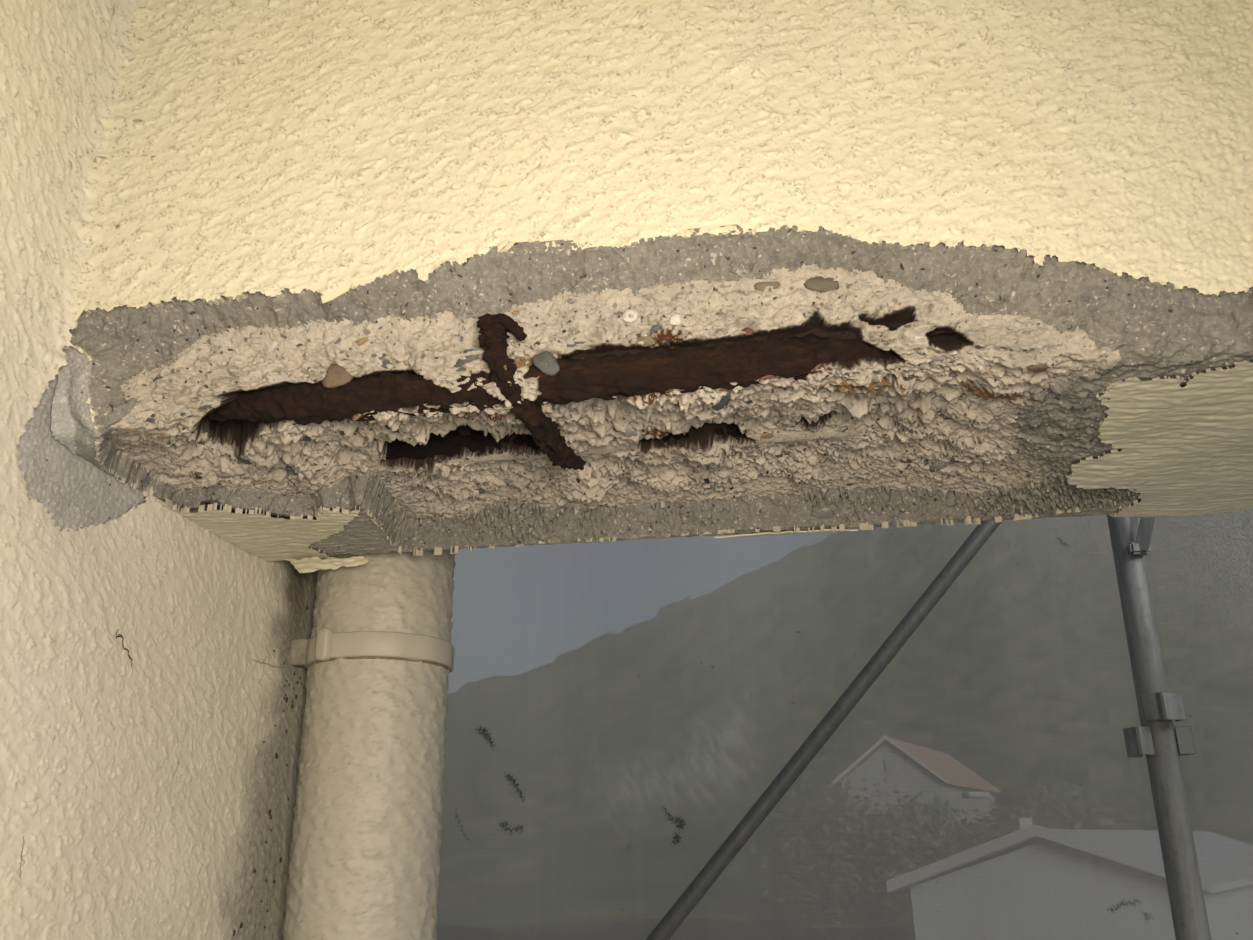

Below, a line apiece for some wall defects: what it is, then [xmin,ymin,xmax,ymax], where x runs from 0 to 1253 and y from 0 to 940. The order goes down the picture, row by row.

spalling [16,224,1253,573]